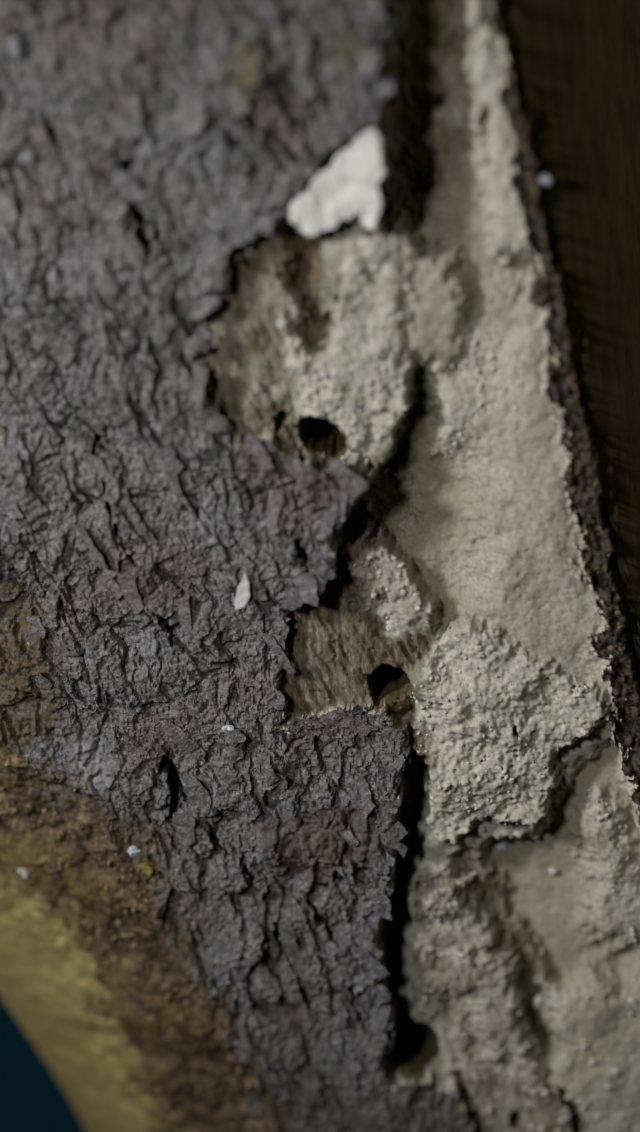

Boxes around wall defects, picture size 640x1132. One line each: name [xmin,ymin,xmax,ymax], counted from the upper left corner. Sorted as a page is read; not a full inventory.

crack [123,42,147,106]
crack [40,113,62,157]
crack [115,157,133,173]
crack [130,201,164,256]
crack [90,434,135,564]
crack [285,529,312,568]
peeling [184,0,640,1132]